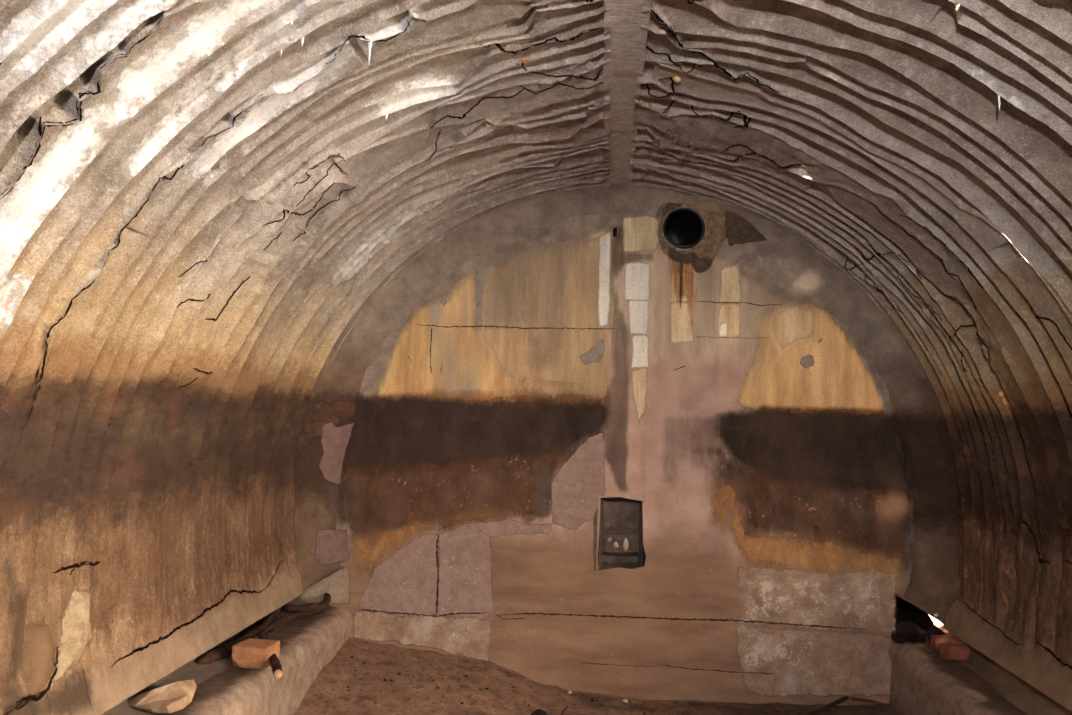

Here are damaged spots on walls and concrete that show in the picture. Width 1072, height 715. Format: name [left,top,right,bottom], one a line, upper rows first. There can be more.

spalling [428,40,610,152]
spalling [634,83,855,192]
spalling [131,156,379,392]
rust [672,260,693,307]
damp [0,216,659,541]
damp [718,304,1072,566]
crack [3,646,58,715]
damp [1,594,90,715]
crack [52,561,101,575]
crack [112,559,283,667]
peeling [300,422,606,661]
crack [357,536,868,630]